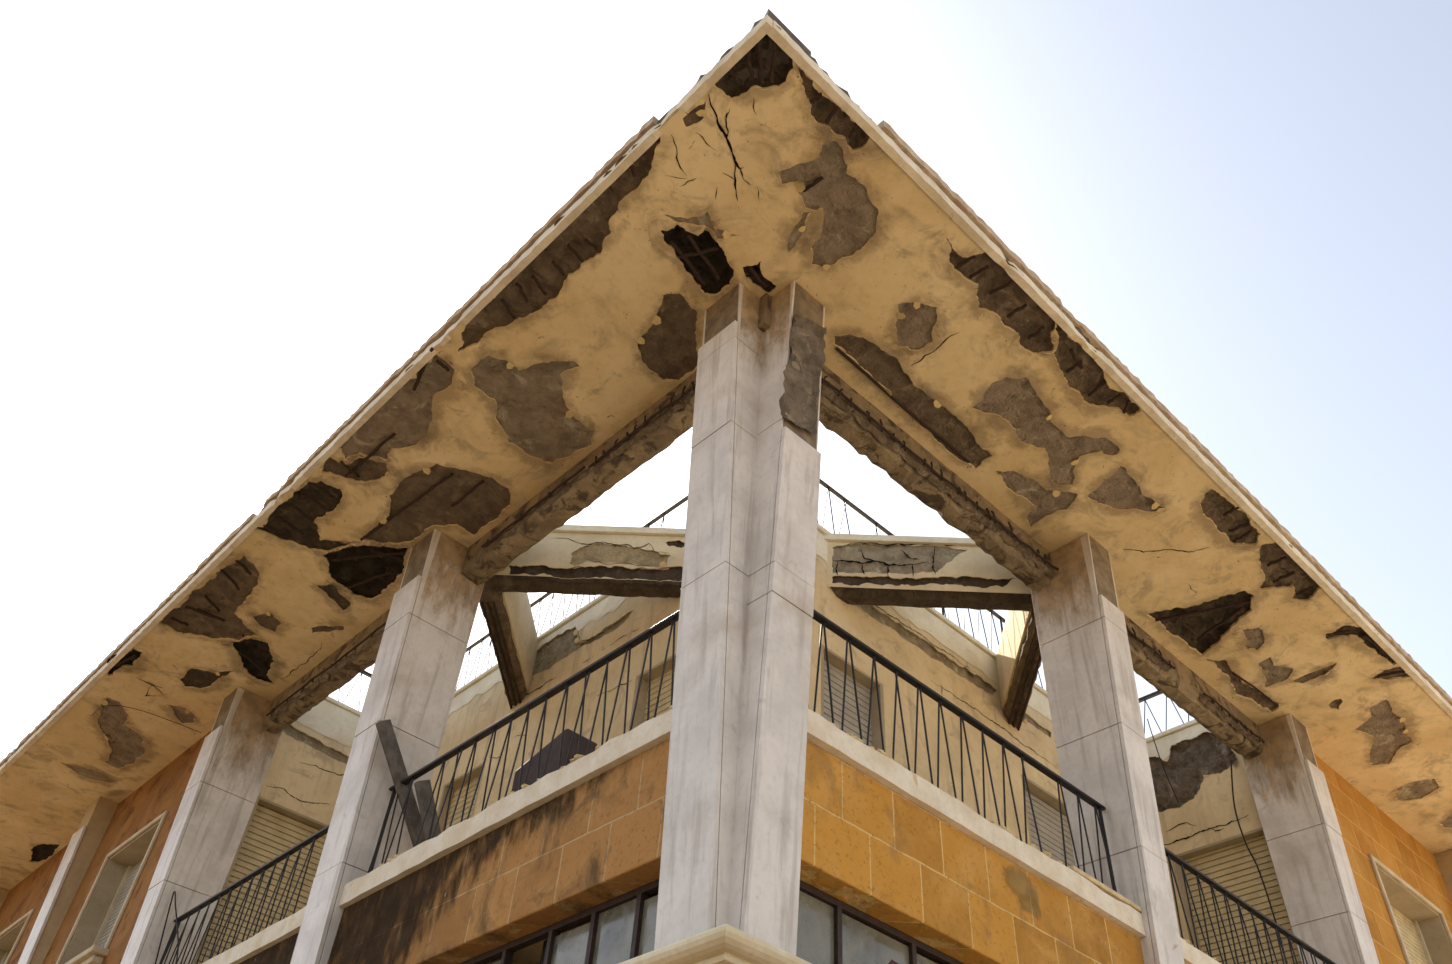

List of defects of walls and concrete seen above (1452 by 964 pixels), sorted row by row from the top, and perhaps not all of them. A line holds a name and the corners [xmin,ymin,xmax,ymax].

crack [671,94,759,201]
peeling [715,24,879,270]
spalling [257,124,698,633]
spalling [661,211,776,294]
peeling [779,302,1166,578]
spalling [947,238,1140,415]
spalling [160,556,281,688]
peeling [532,612,631,676]
peeling [832,544,1012,694]
spalling [1149,489,1336,710]
spalling [1326,625,1408,679]
spalling [1149,693,1265,812]